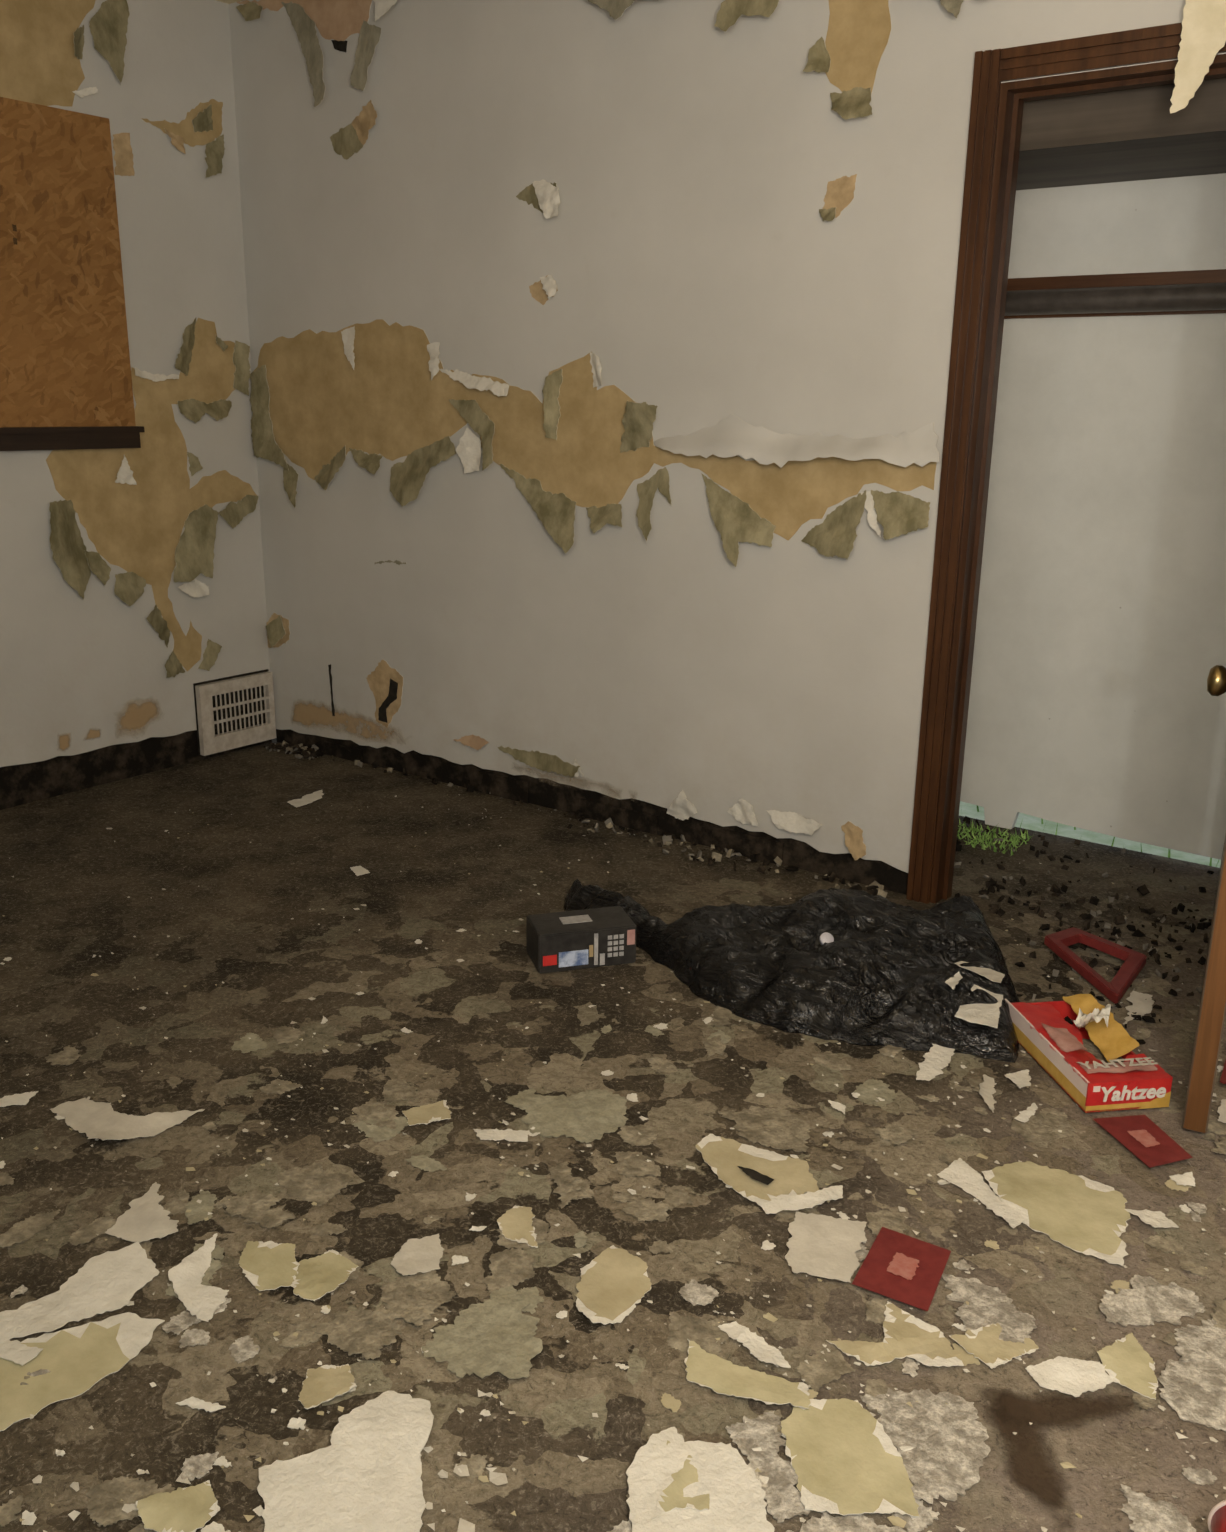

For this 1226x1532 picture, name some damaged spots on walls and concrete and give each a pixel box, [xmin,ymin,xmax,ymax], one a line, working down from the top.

spalling [366,659,404,728]